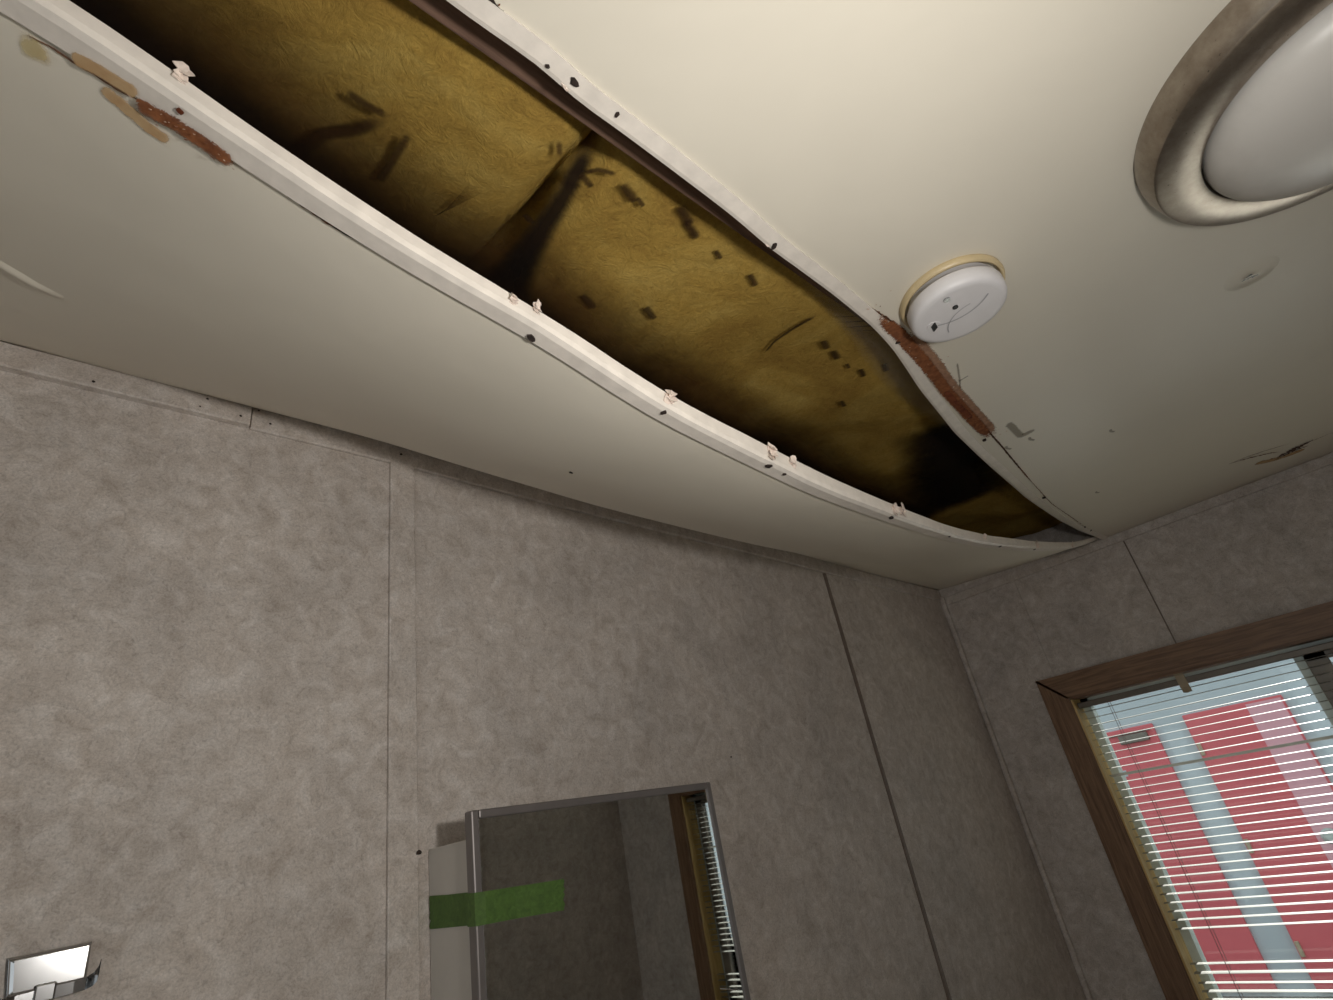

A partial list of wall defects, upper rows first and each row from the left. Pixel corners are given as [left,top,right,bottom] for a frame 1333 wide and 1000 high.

peeling [27,35,234,170]
damp [70,0,1002,518]